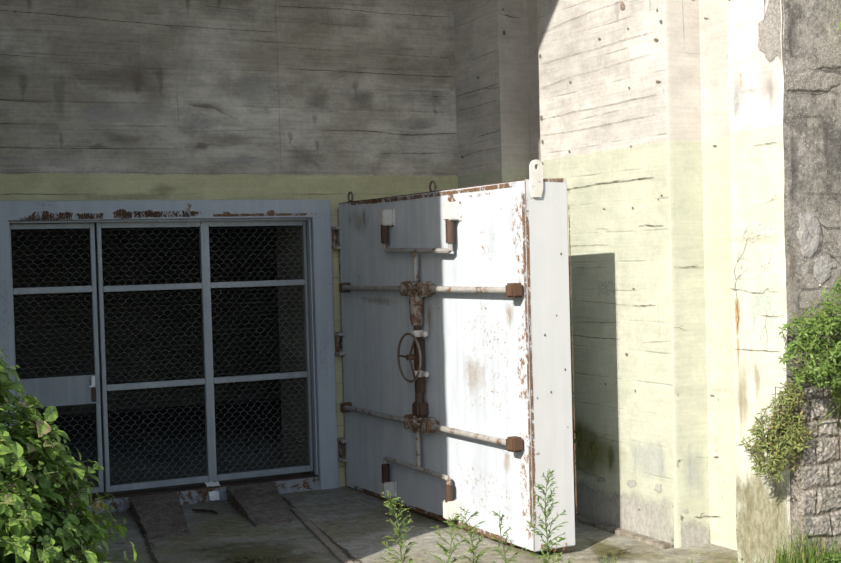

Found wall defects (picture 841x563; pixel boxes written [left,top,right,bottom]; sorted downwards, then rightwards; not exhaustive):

spalling [758,0,781,62]
corrosion [19,201,199,221]
corrosion [344,182,515,205]
corrosion [464,193,539,540]